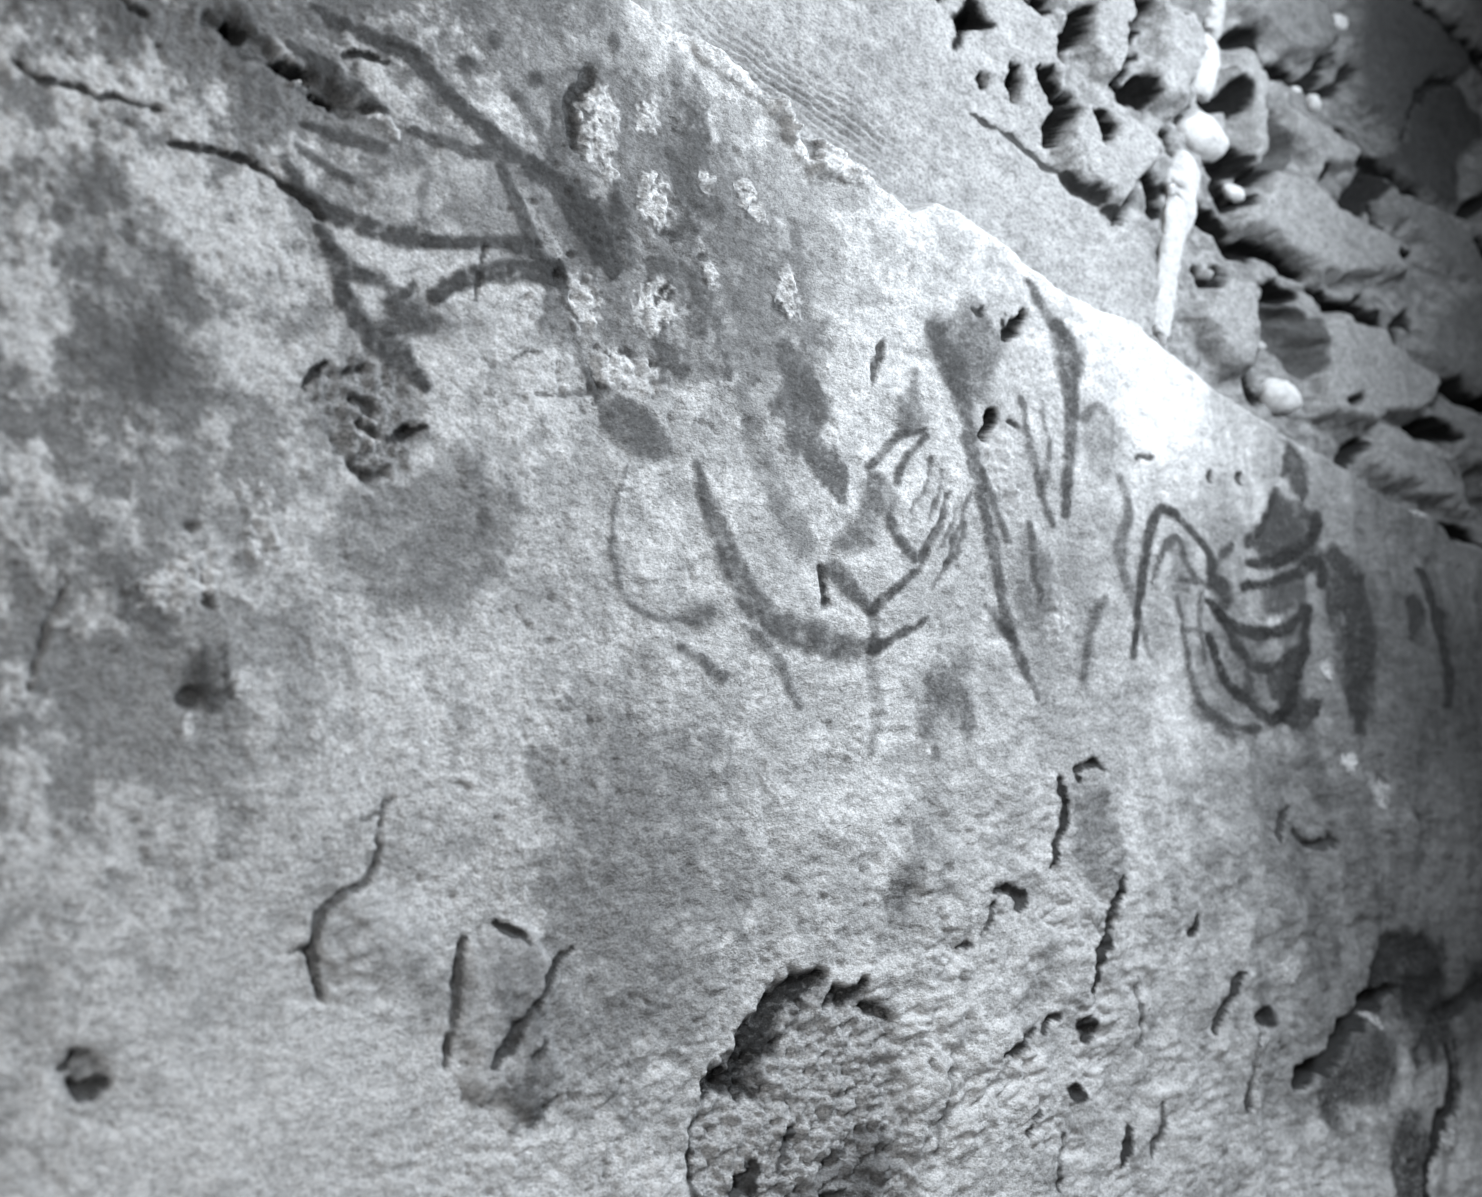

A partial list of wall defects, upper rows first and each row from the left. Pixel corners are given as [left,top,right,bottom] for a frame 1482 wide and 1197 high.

flaking render [986,432,1020,505]
water stain [175,643,230,712]
water stain [961,700,975,731]
water stain [1319,544,1376,735]
water stain [1406,567,1455,708]
crack [287,797,394,999]
crack [442,918,575,1070]
water stain [1390,1110,1430,1197]
crack [1423,1040,1461,1197]